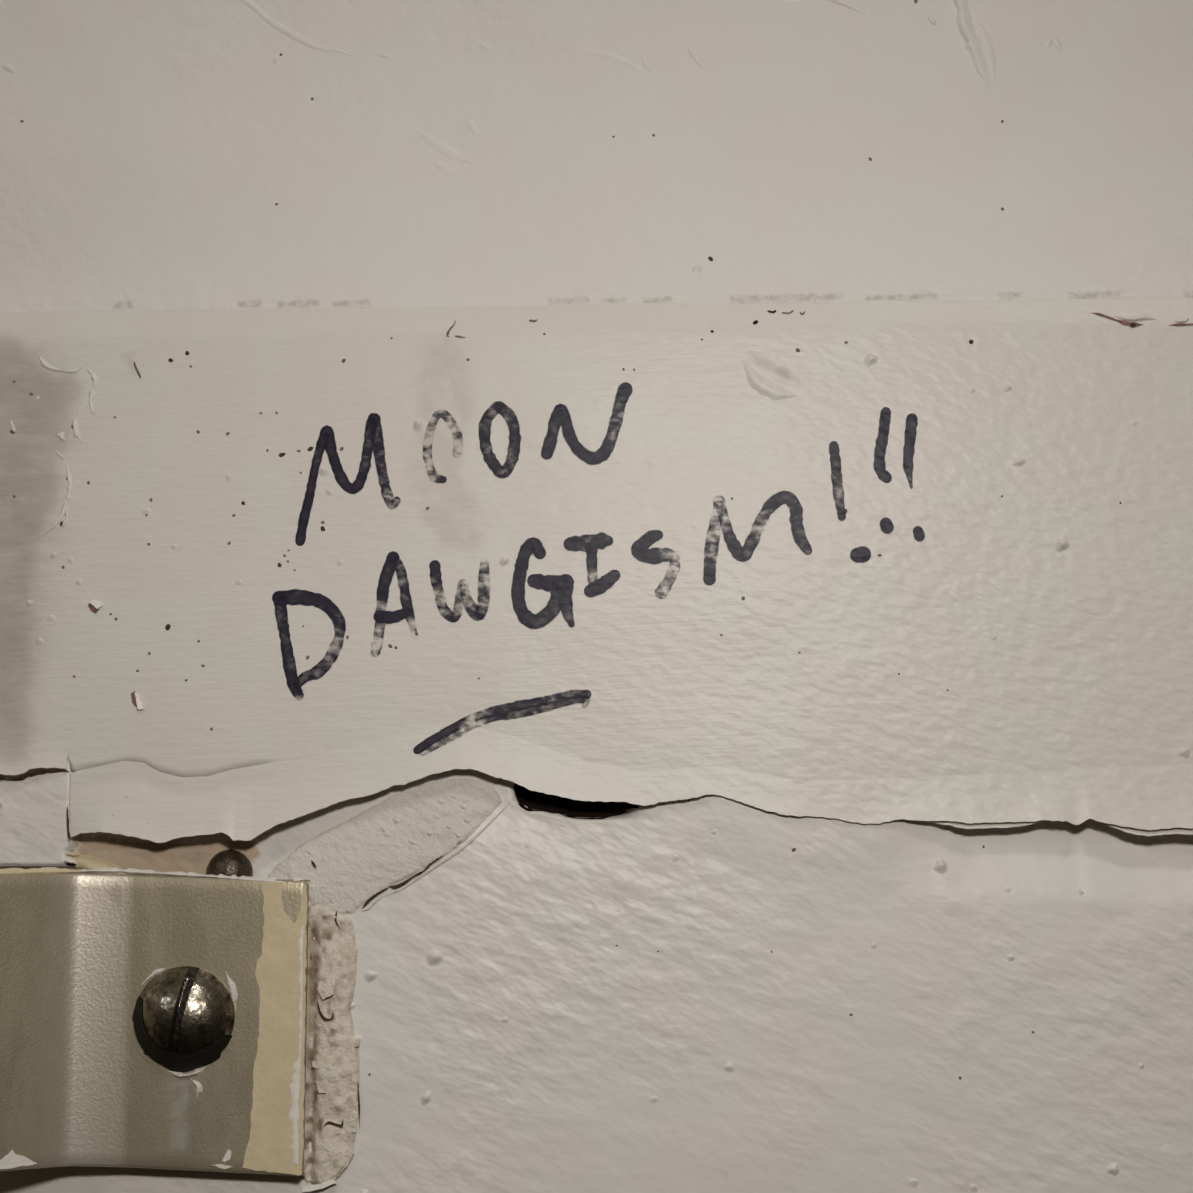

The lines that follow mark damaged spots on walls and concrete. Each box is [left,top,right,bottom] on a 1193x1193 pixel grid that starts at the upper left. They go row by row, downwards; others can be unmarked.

peeling [0,725,1193,1192]